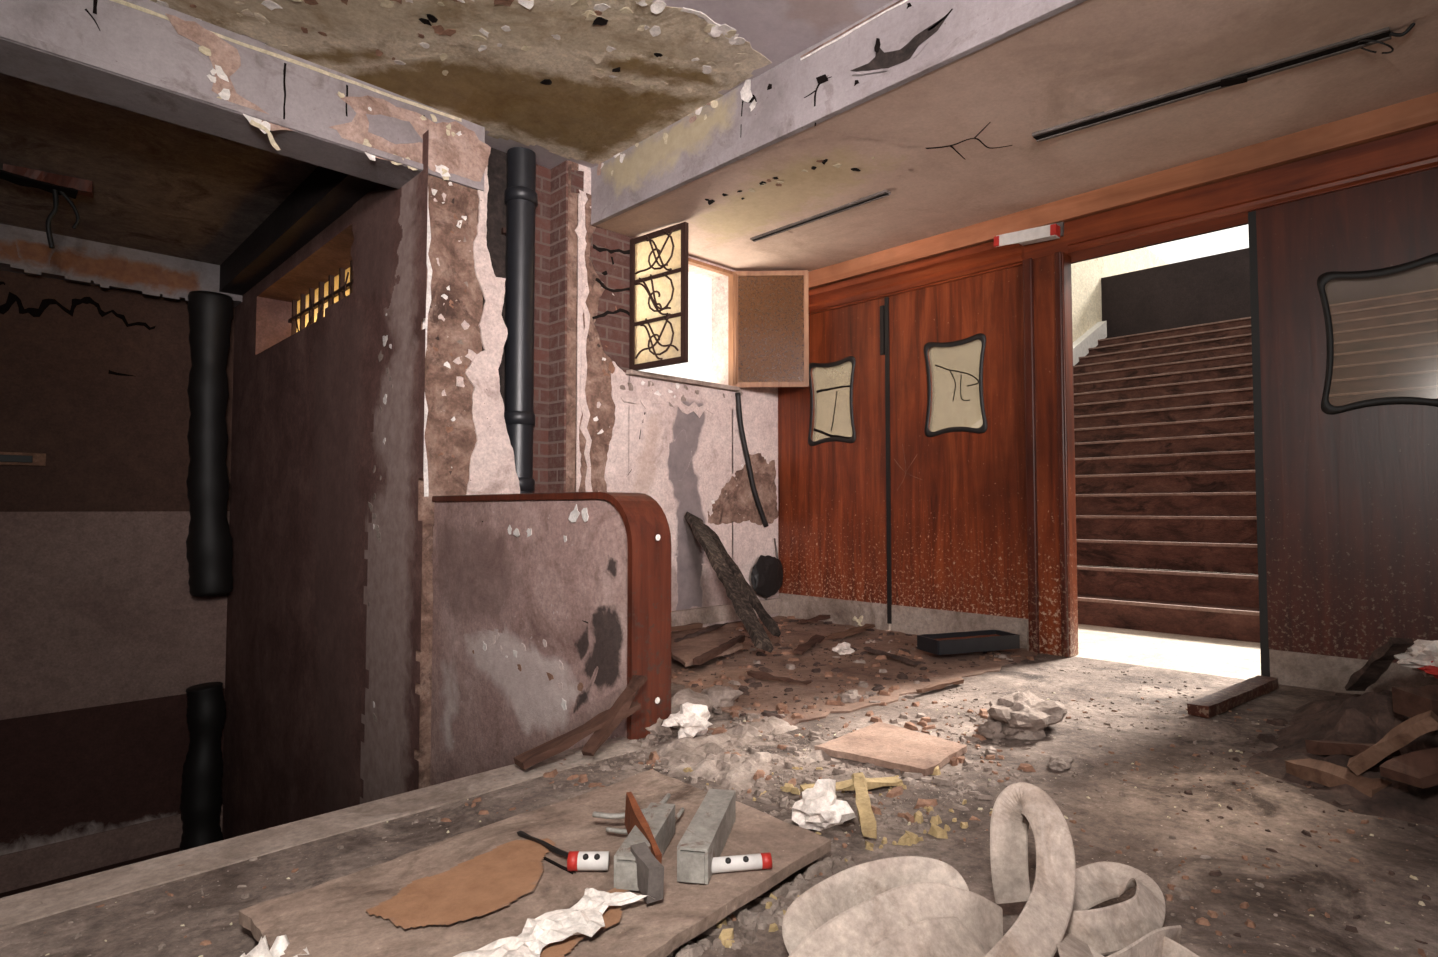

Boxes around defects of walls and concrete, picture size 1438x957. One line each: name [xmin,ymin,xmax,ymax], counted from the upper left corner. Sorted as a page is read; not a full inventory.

crack [84,0,170,31]
peeling [156,0,327,150]
crack [211,31,462,122]
peeling [376,0,772,111]
crack [800,0,908,126]
peeling [705,177,784,205]
crack [0,281,156,330]
crack [108,369,134,377]
spalling [564,159,743,542]
peeling [329,91,520,804]
peeling [507,525,532,537]
spalling [708,453,778,525]